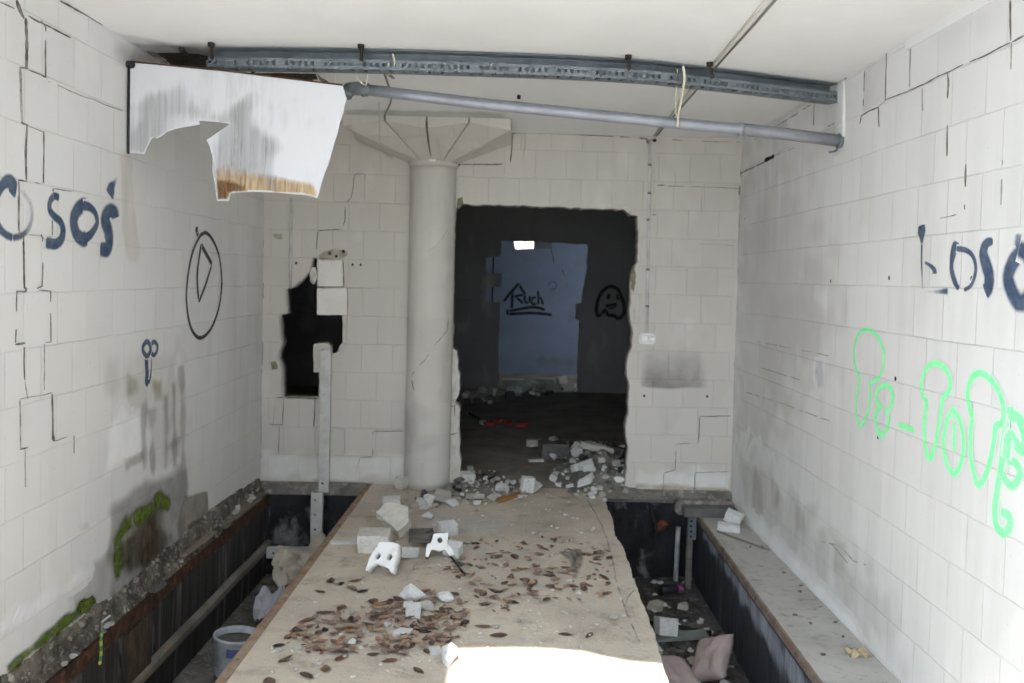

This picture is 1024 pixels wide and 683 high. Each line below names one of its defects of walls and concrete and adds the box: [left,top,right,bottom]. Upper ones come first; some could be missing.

spalling [256,73,328,82]
water stain [74,317,208,601]
spalling [451,377,460,475]
crack [662,416,729,490]
spalling [68,505,290,683]